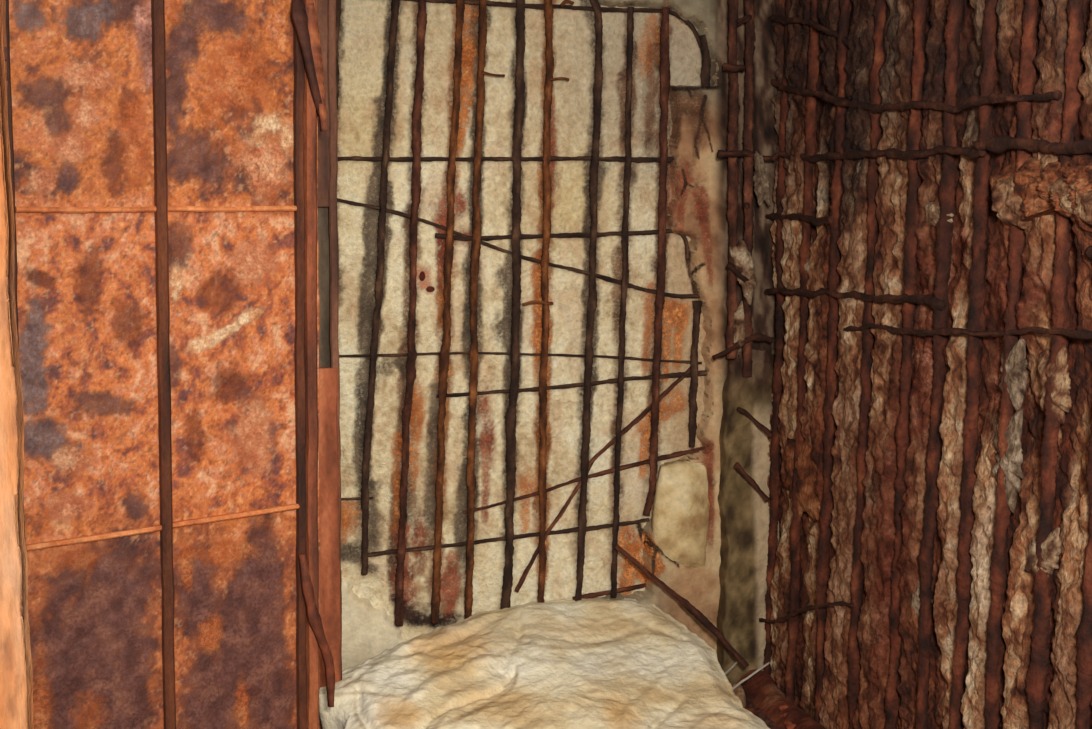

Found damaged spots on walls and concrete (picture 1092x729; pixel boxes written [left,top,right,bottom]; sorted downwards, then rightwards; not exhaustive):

rust [52,447,91,476]
rust [238,133,287,199]
damp [341,174,407,573]
damp [380,20,398,122]
rust [341,0,557,627]
damp [462,253,481,352]
damp [496,254,513,348]
rust [609,359,665,594]
rust [612,0,713,477]
rust [703,441,714,543]
spalling [336,0,1092,729]
rust [776,0,908,229]